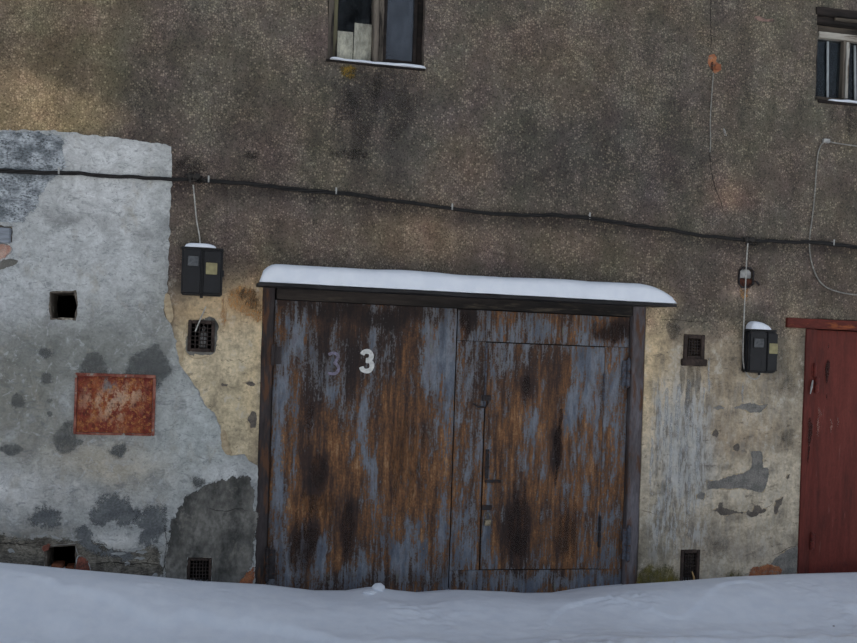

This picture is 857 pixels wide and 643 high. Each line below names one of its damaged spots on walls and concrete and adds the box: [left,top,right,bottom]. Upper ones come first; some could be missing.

peeling [713,402,768,414]
peeling [247,411,257,429]
peeling [696,450,770,501]
peeling [713,497,783,517]
spalling [0,533,164,577]
peeling [749,546,798,576]
flaking render [239,567,255,584]